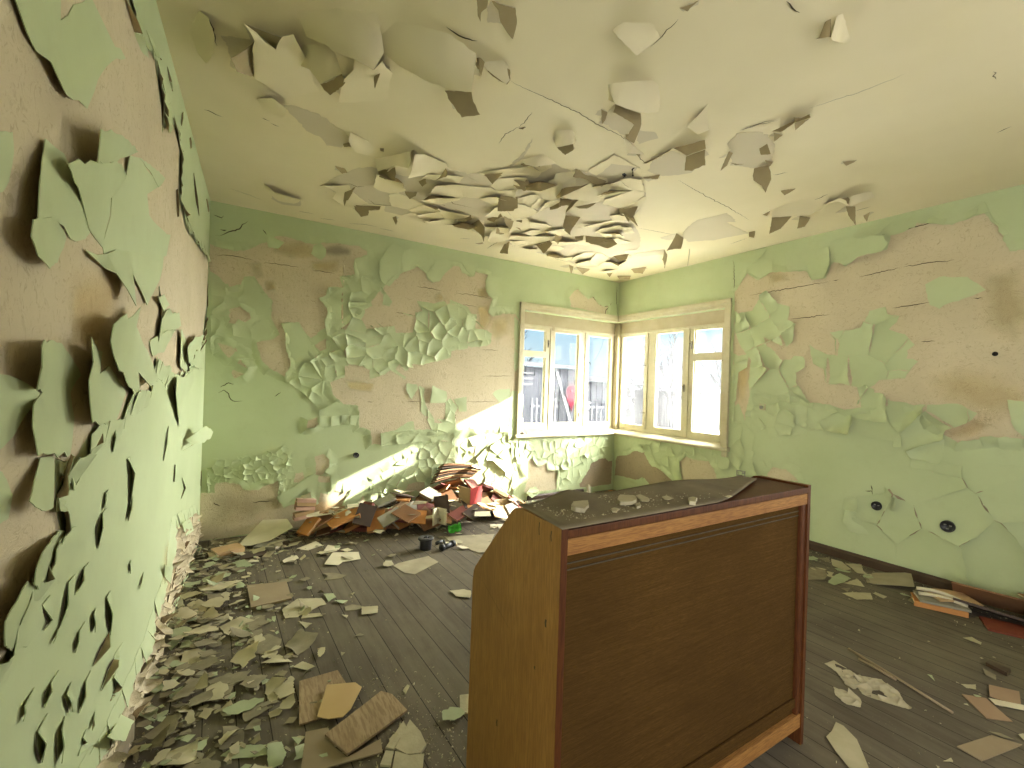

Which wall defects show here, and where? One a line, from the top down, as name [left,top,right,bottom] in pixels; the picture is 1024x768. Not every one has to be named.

crack [499,81,645,179]
peeling [190,8,1024,470]
peeling [0,0,525,768]
peeling [516,451,571,499]
peeling [761,460,806,484]